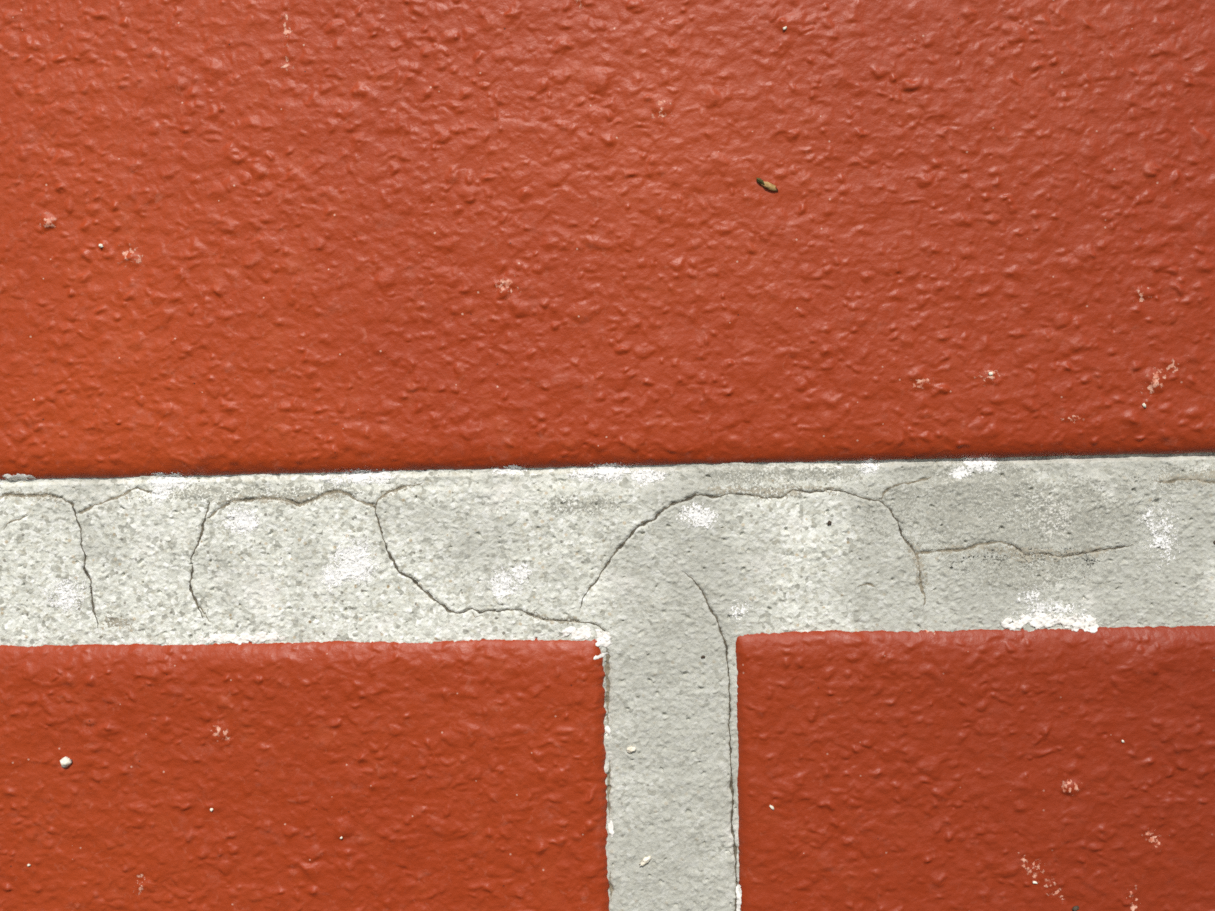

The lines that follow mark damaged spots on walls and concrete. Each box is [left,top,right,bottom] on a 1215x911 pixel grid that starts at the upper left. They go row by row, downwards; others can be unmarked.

crack [1154,466,1215,487]
crack [0,487,152,630]
crack [189,477,1133,722]
crack [605,762,613,813]
crack [687,574,738,911]